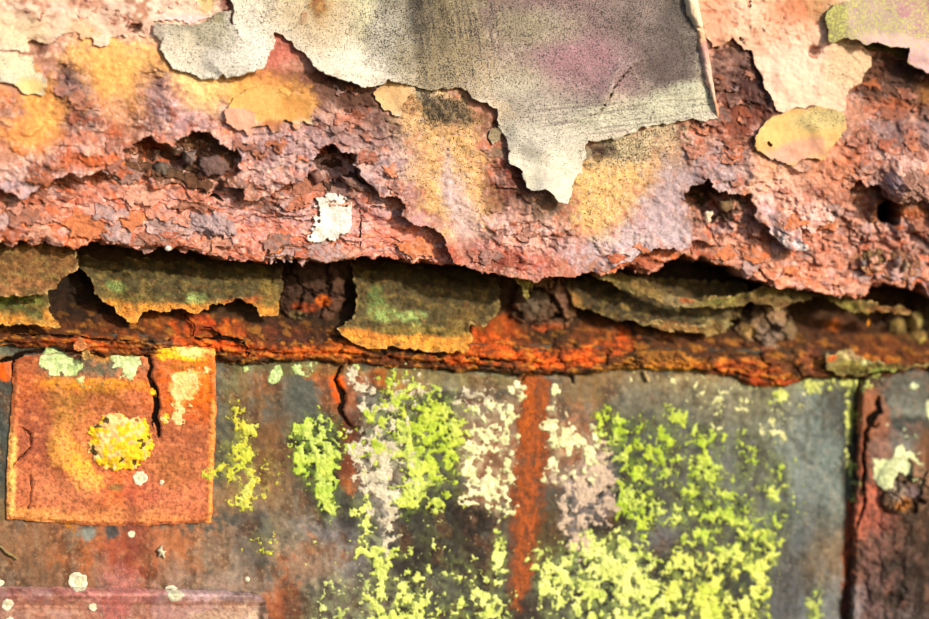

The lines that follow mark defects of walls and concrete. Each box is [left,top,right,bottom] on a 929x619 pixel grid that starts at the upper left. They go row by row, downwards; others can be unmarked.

peeling [0,0,929,211]
peeling [0,85,505,354]
peeling [514,229,541,243]
peeling [513,277,543,300]
peeling [556,179,929,337]
crack [0,313,286,438]
crack [333,365,359,430]
rust [510,375,550,609]
crack [855,378,882,527]
rust [100,569,135,619]
rust [840,498,859,619]